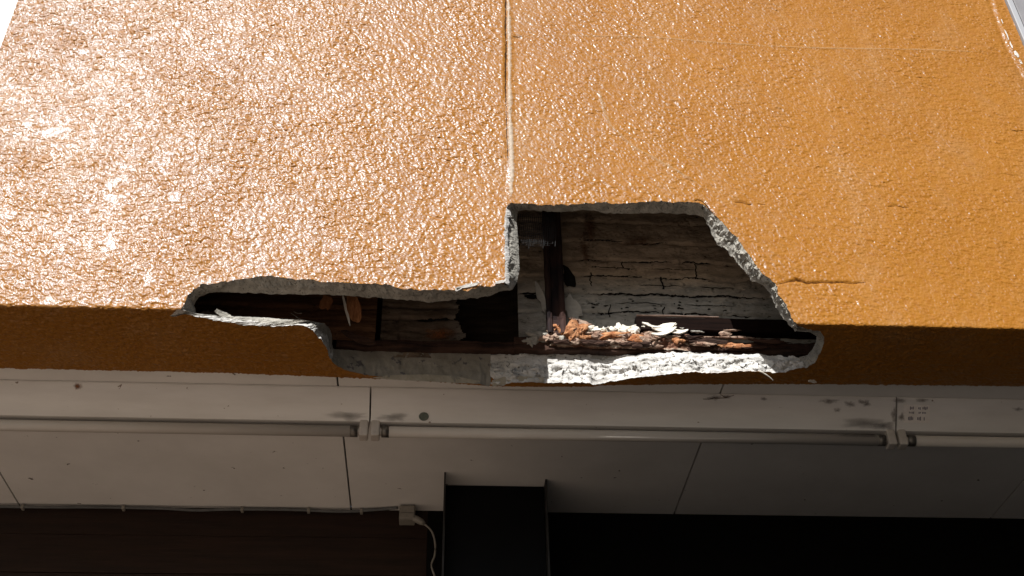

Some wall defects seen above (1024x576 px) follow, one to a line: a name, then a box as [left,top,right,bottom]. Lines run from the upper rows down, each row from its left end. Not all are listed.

spalling [171,201,824,387]
crack [578,239,864,318]